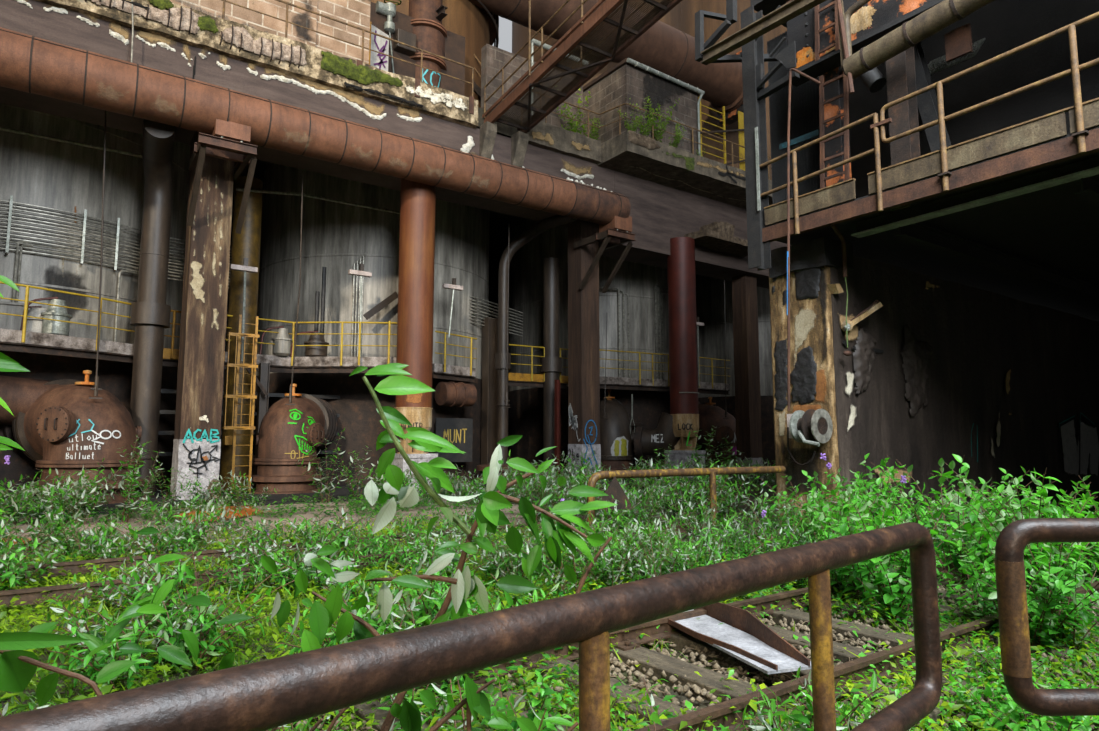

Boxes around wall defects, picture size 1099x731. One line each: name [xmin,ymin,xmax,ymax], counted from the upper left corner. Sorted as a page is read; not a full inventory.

peeling [190,261,218,329]
peeling [794,309,816,357]
rust [406,393,423,403]